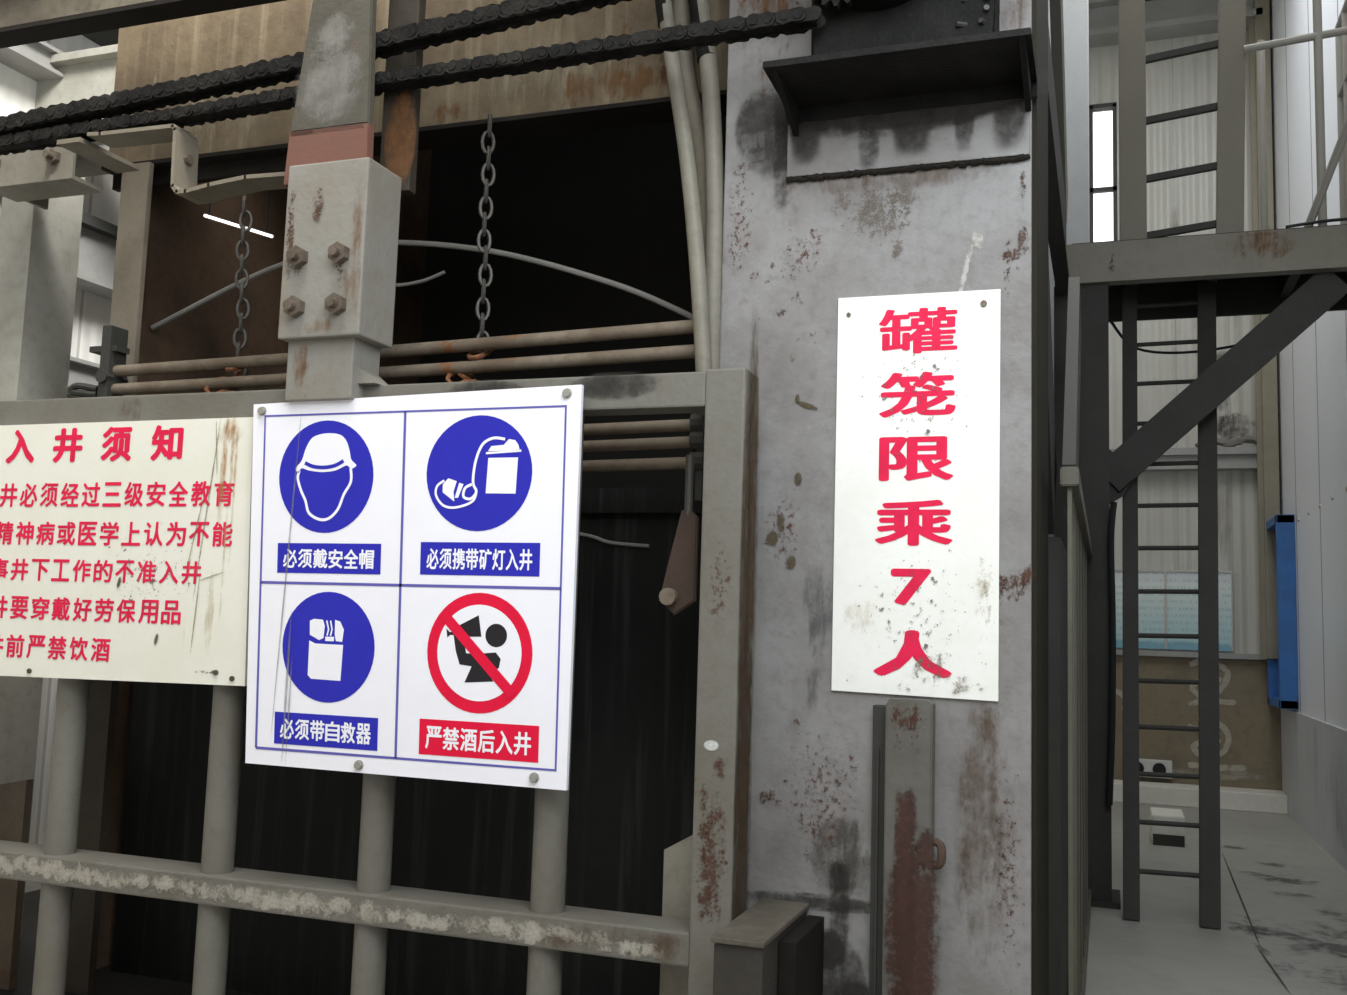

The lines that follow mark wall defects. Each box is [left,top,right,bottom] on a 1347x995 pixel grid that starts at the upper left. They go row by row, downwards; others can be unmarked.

damp [775,97,821,203]
damp [894,108,930,150]
damp [956,115,973,140]
damp [994,98,1025,142]
corrosion [694,327,866,921]
corrosion [885,790,939,995]